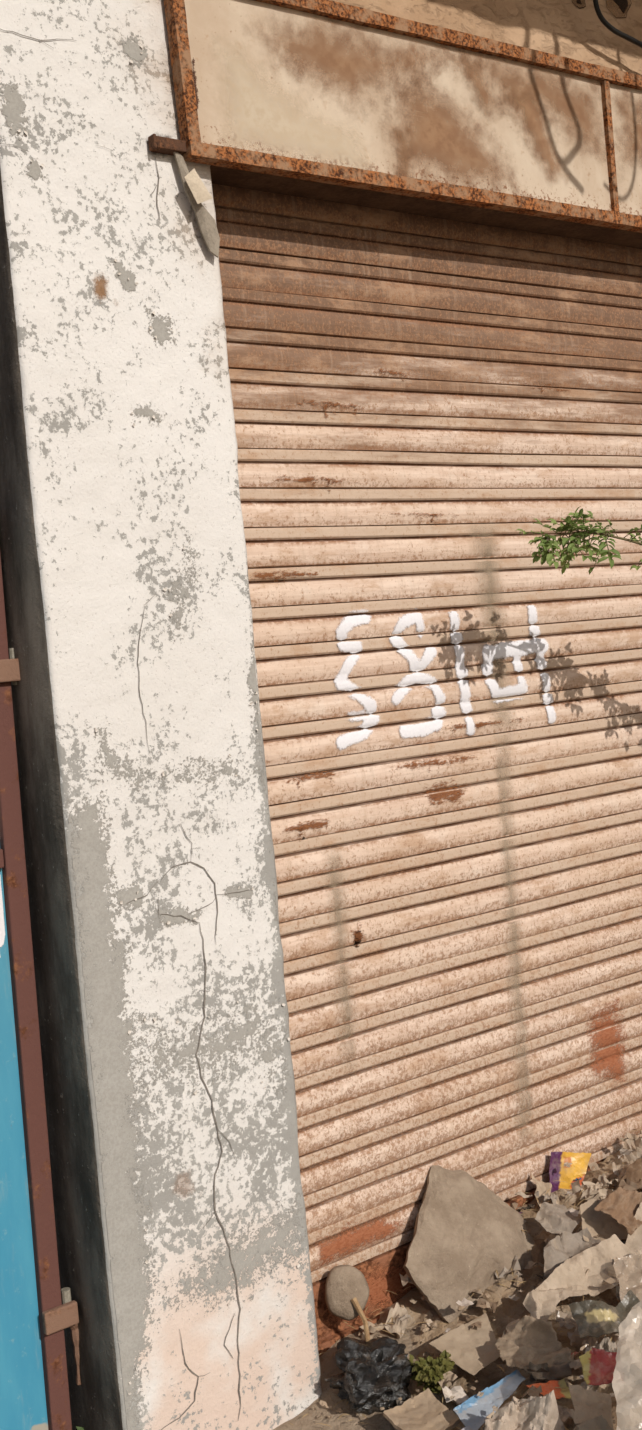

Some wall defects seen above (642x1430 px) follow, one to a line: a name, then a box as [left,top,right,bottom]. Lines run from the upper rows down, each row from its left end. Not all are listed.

peeling [118,32,148,70]
peeling [0,82,31,140]
peeling [26,158,46,180]
peeling [110,257,138,292]
peeling [144,305,178,350]
peeling [131,404,167,427]
peeling [158,526,208,644]
peeling [67,586,309,1430]
rust [589,1002,627,1081]
crack [128,824,251,1430]
rust [319,1216,399,1268]
rust [325,1264,415,1324]